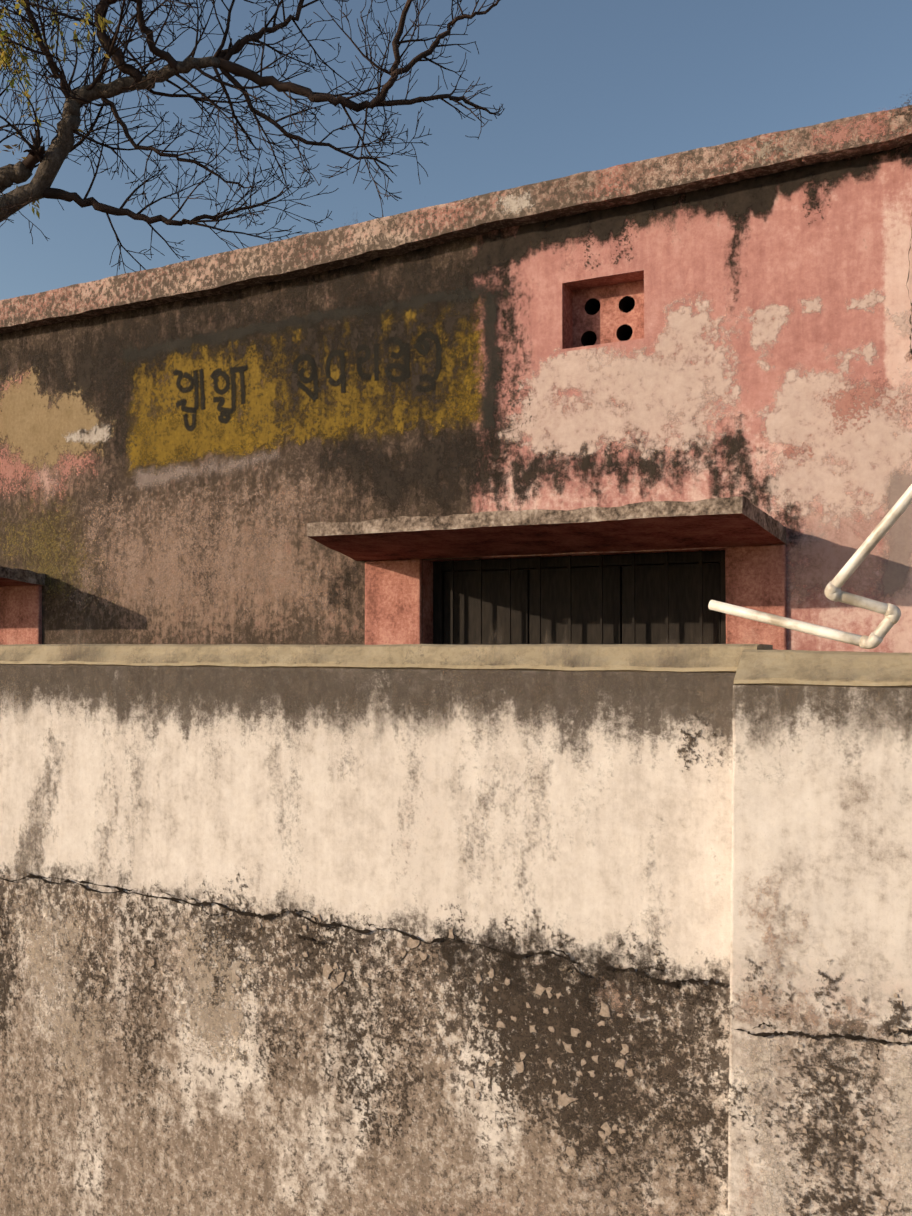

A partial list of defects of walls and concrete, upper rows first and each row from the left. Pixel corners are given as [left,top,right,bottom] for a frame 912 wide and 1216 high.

flaking render [0,367,114,512]
leakage [0,97,912,619]
flaking render [499,296,740,459]
flaking render [741,297,822,371]
flaking render [758,342,912,602]
leakage [628,652,722,772]
leakage [0,761,57,1039]
leakage [66,885,177,1119]
crack [0,871,727,988]
leakage [189,873,912,1216]
flaking render [488,966,638,1107]
crack [736,1022,912,1060]